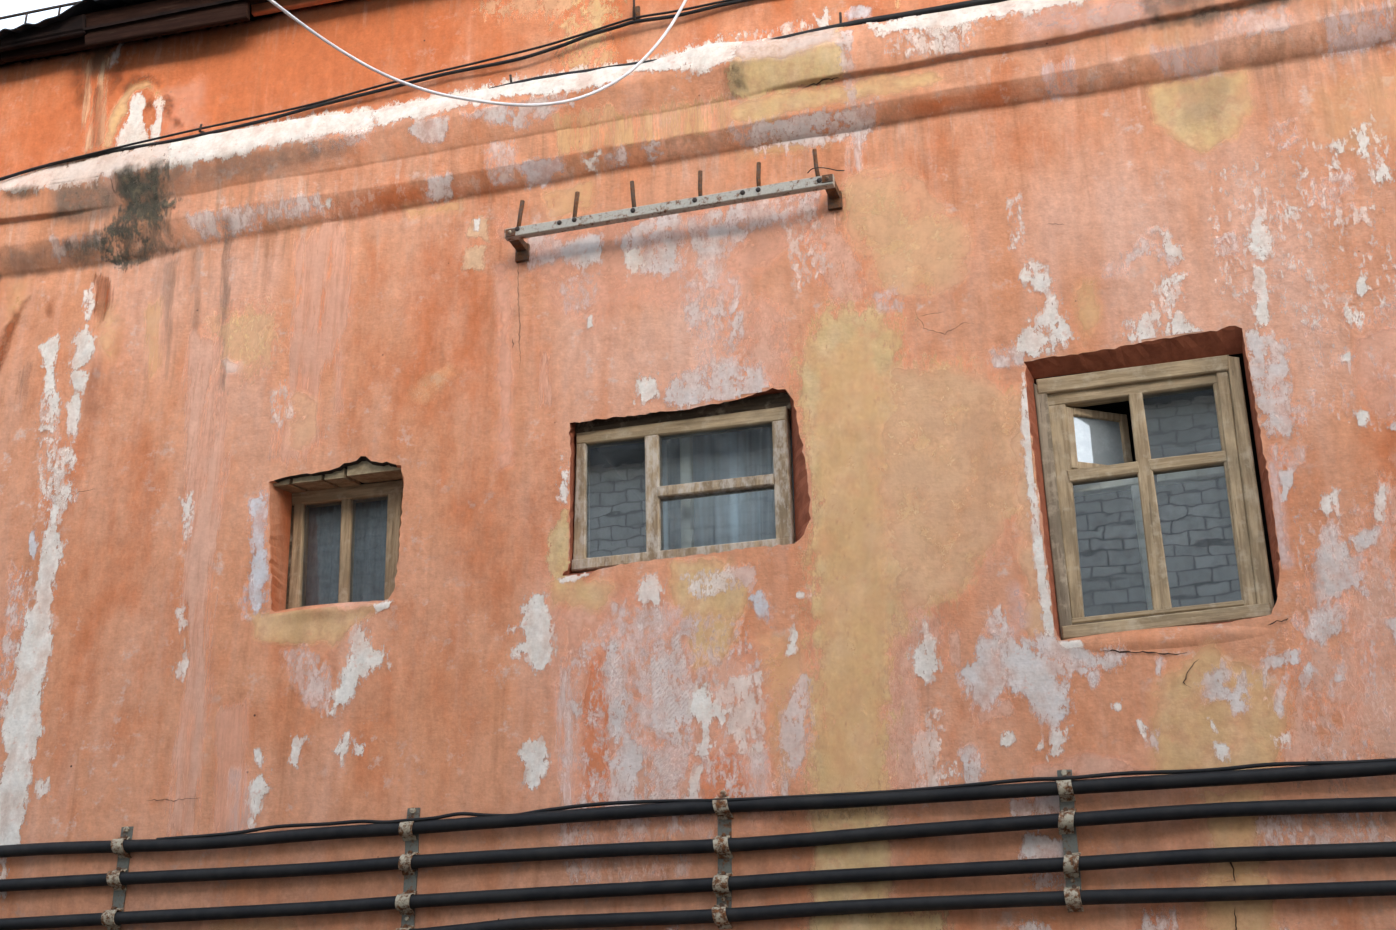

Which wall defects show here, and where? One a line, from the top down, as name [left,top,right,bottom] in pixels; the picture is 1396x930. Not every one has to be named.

water stain [55,44,184,318]
peeling [0,0,1088,194]
peeling [1150,71,1252,151]
water stain [1155,0,1288,37]
peeling [1122,226,1204,344]
peeling [1136,110,1396,775]
peeling [0,282,98,899]
peeling [243,492,392,769]
peeling [507,191,1131,930]
peeling [244,747,272,829]
crack [1229,862,1237,930]
peeling [1207,794,1389,930]